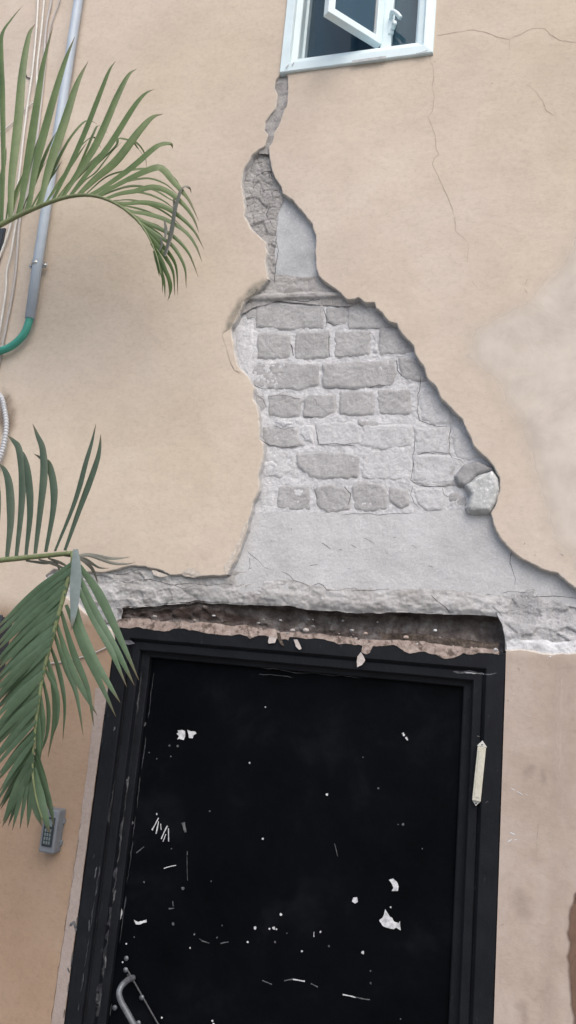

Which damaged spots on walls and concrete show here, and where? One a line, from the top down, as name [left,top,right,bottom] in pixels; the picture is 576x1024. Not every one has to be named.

spalling [87,74,576,667]